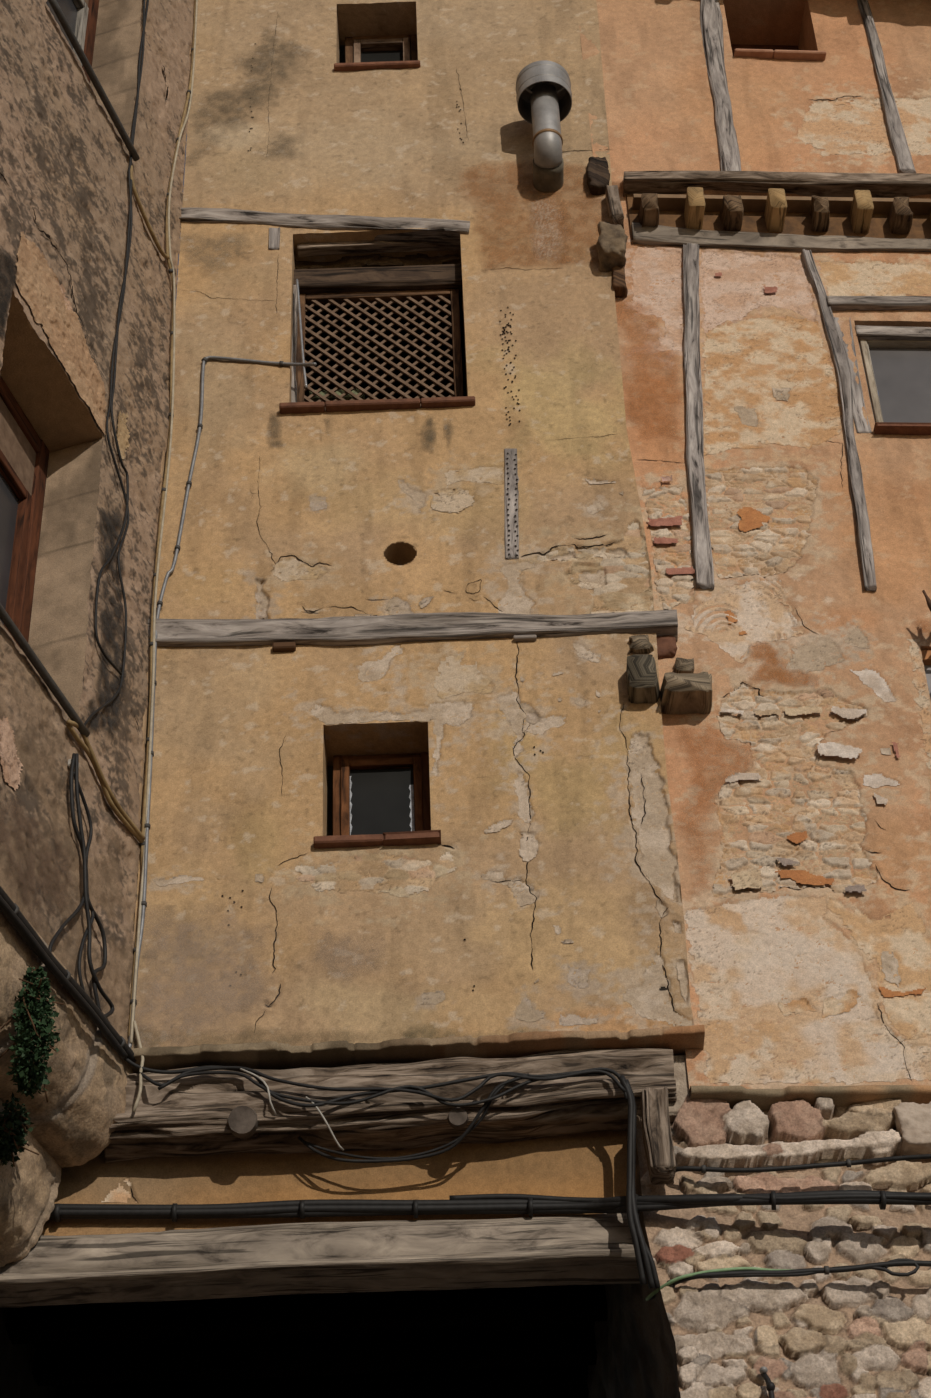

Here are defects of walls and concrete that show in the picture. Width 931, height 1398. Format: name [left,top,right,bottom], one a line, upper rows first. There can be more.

peeling [630,245,685,352]
crack [251,456,331,571]
peeling [398,467,504,513]
crack [521,535,614,557]
spalling [498,475,695,615]
peeling [700,251,931,578]
crack [254,852,309,1032]
crack [494,644,537,970]
crack [619,704,682,1016]
peeling [623,639,931,1086]